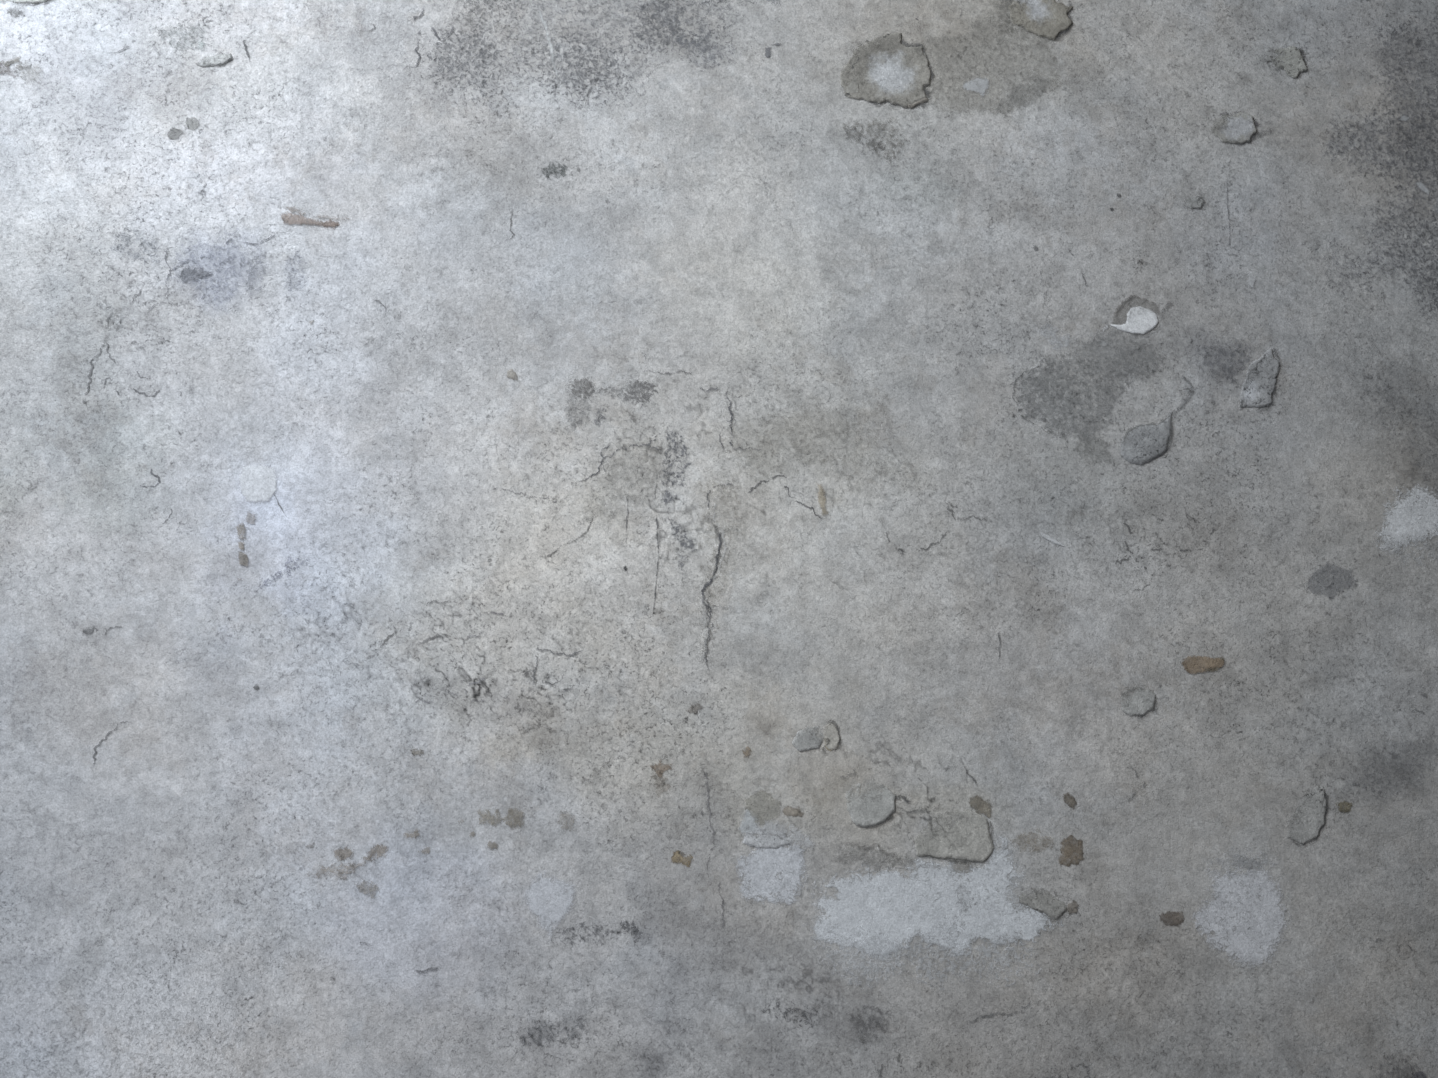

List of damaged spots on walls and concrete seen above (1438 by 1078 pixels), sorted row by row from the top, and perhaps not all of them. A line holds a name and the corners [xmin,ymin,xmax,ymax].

spalling [839,32,934,108]
spalling [1008,0,1073,40]
leakage [1319,16,1438,312]
leakage [1012,330,1170,442]
crack [494,436,661,503]
crack [541,485,659,615]
crack [644,355,820,662]